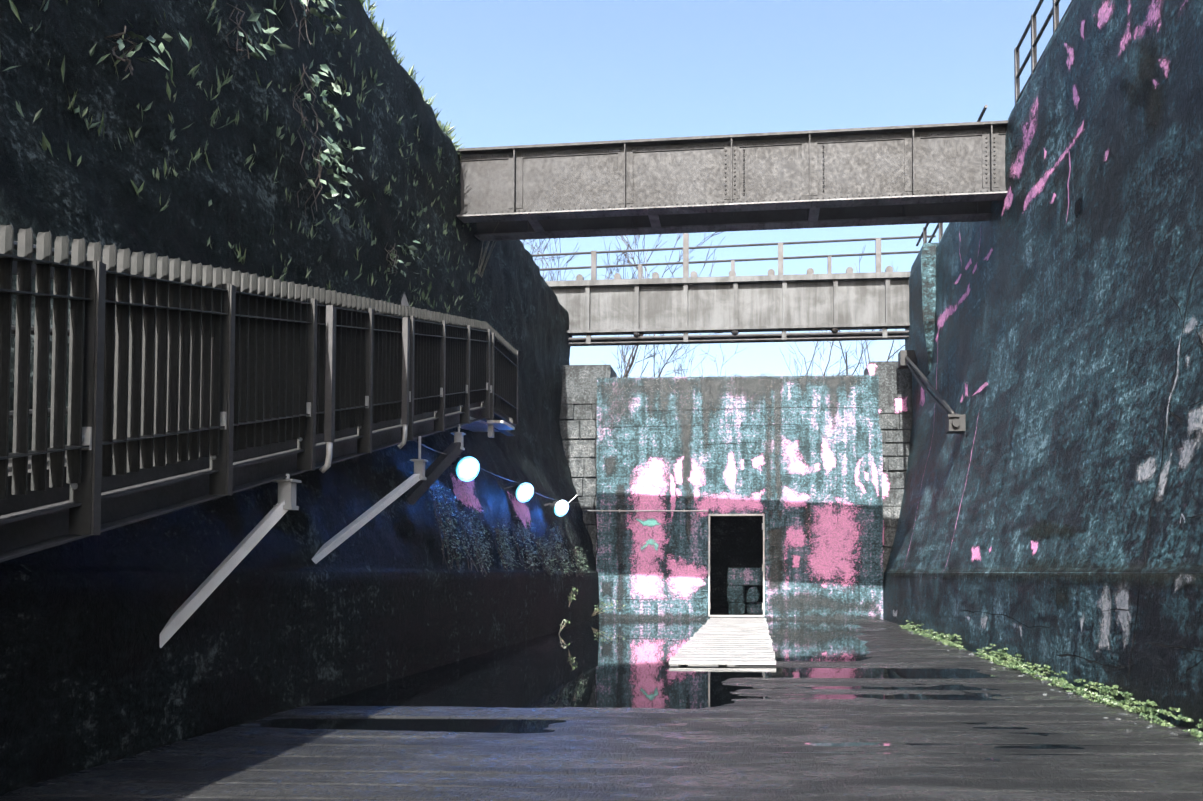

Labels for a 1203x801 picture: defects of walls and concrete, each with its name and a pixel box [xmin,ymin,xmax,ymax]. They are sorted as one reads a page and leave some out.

water stain [599,375,880,620]
crack [963,254,1203,685]